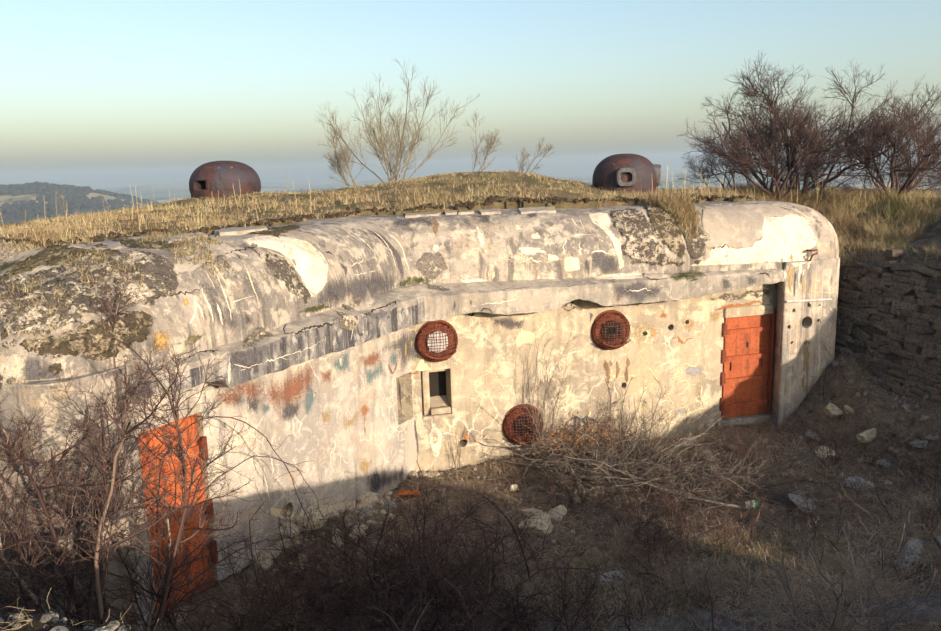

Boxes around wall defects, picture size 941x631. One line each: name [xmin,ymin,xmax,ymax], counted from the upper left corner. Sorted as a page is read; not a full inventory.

leakage [476,215,489,249]
leakage [512,213,673,303]
peeling [589,208,817,269]
crack [235,300,400,370]
leakage [23,358,57,380]